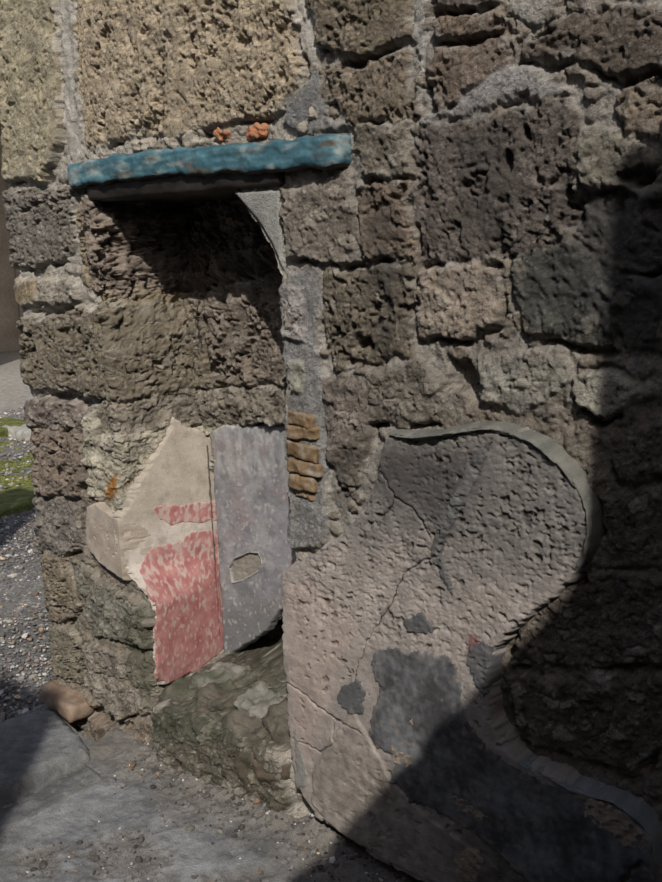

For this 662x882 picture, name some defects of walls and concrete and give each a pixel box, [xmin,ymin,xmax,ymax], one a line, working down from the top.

peeling [139,501,263,685]
peeling [583,798,644,847]